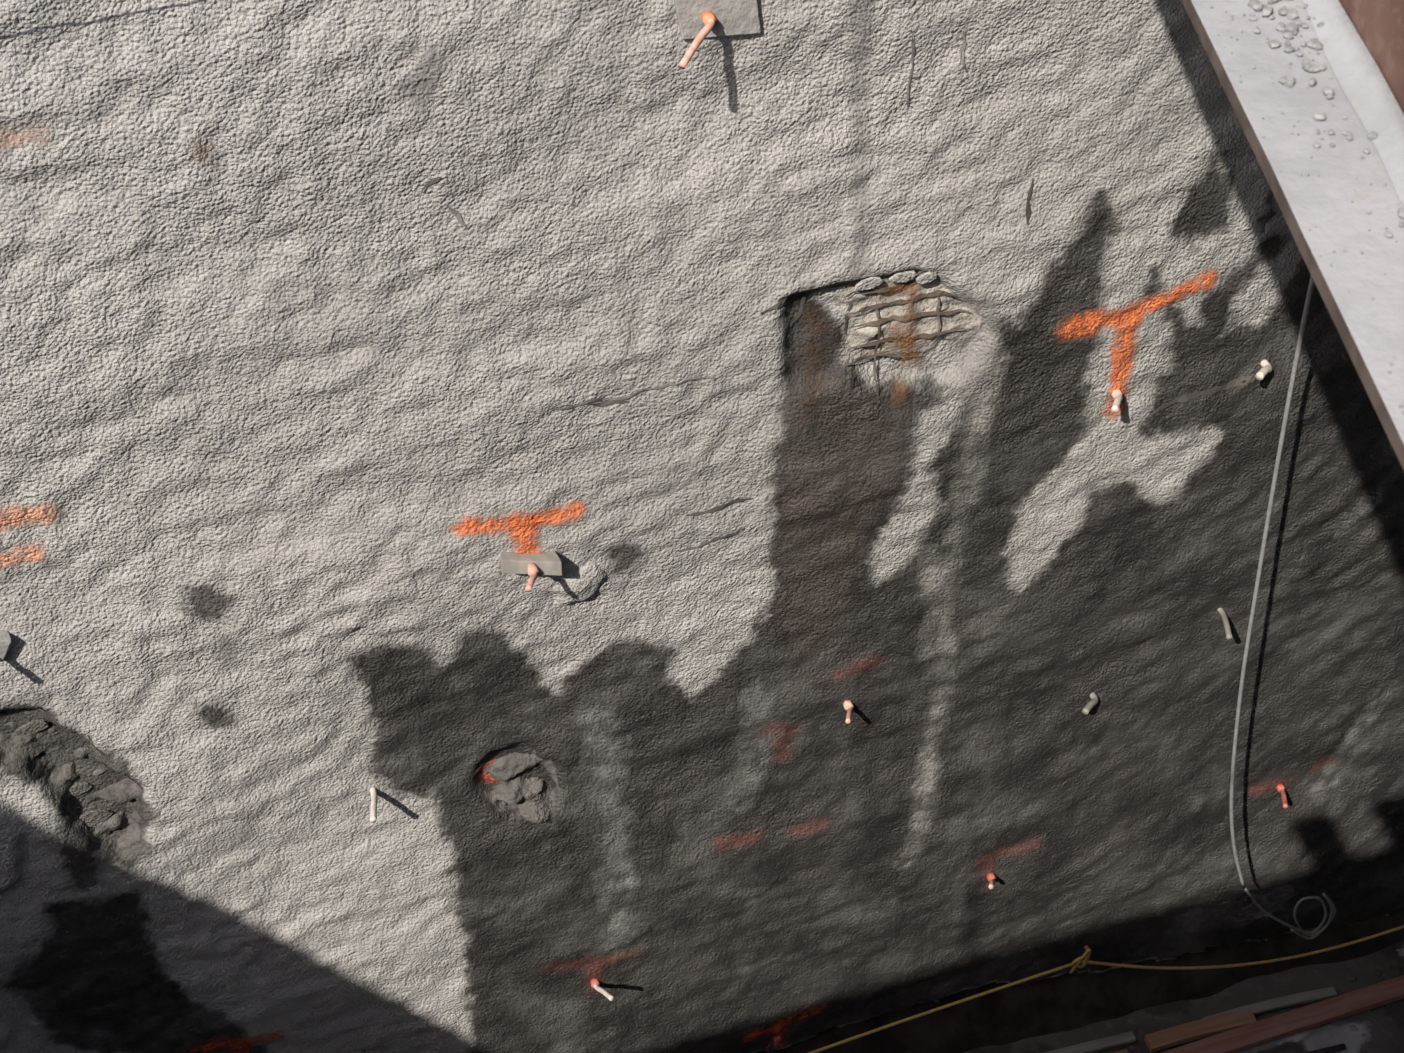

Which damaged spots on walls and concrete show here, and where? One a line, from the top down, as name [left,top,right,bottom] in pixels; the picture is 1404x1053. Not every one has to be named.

leakage [1172,153,1233,241]
rust [889,279,916,311]
spalling [834,270,990,402]
leakage [352,191,1404,1053]
spalling [0,708,143,855]
spalling [474,743,560,813]
leakage [0,705,267,1053]